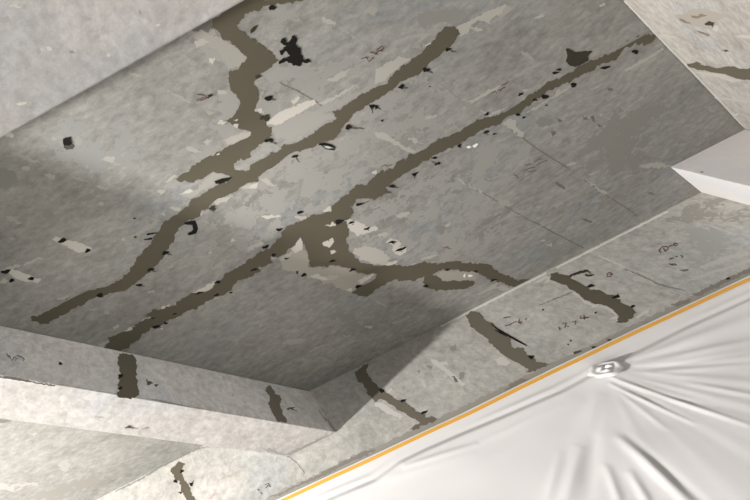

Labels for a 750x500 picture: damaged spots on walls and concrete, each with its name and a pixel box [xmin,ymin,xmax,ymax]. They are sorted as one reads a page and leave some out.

hole [279,35,311,66]
hole [566,48,592,67]
crack [491,324,527,346]
crack [115,446,209,492]